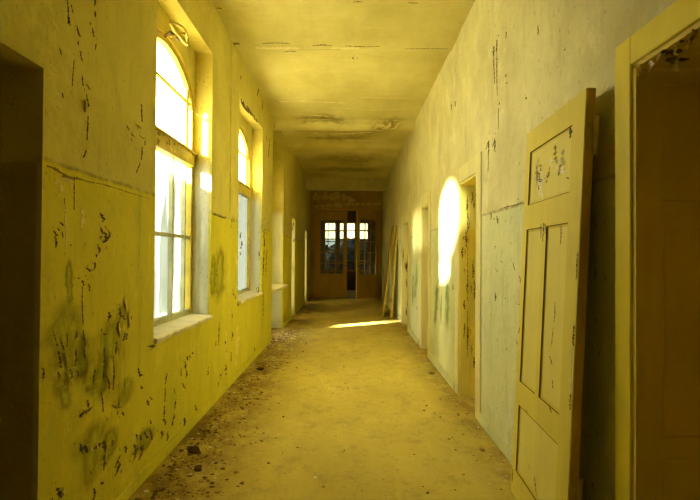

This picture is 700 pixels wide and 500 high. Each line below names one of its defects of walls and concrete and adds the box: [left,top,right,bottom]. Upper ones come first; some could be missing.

peeling [637,29,698,81]
peeling [42,213,132,420]
leakage [210,252,224,295]
peeling [461,193,476,367]
peeling [74,352,194,476]